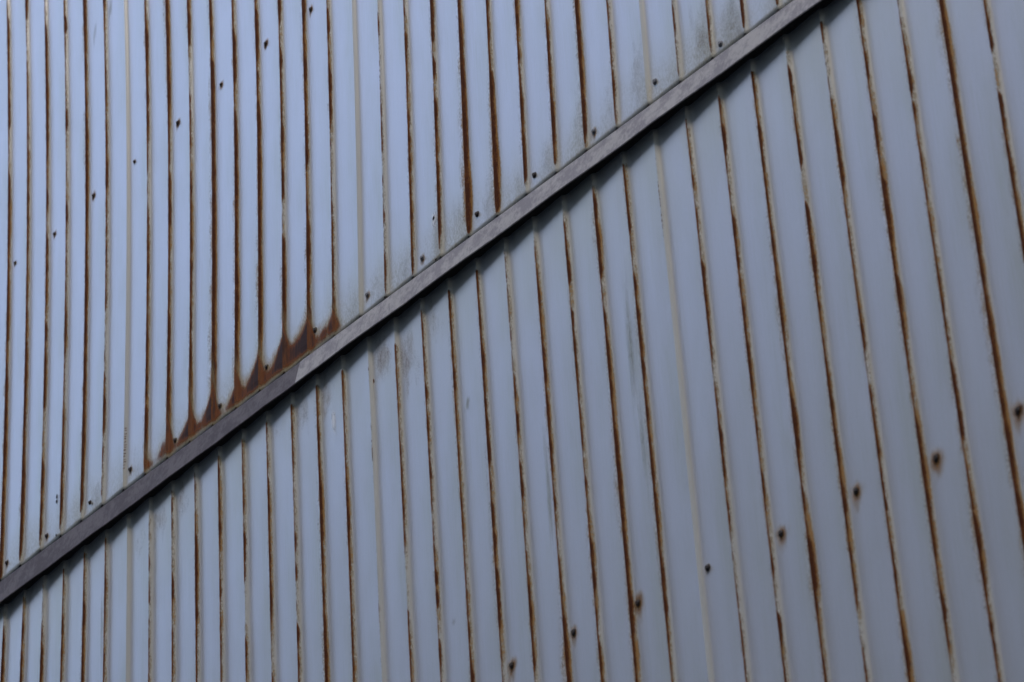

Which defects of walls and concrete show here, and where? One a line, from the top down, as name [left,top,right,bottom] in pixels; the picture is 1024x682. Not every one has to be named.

rust [143,0,339,472]
rust [476,270,515,682]
rust [534,246,576,682]
rust [592,187,642,682]
rust [622,164,674,682]
rust [718,97,787,682]
rust [751,71,827,682]
rust [786,52,868,682]
rust [820,22,915,682]
rust [856,0,954,682]
rust [897,0,1002,682]
rust [936,0,1024,549]